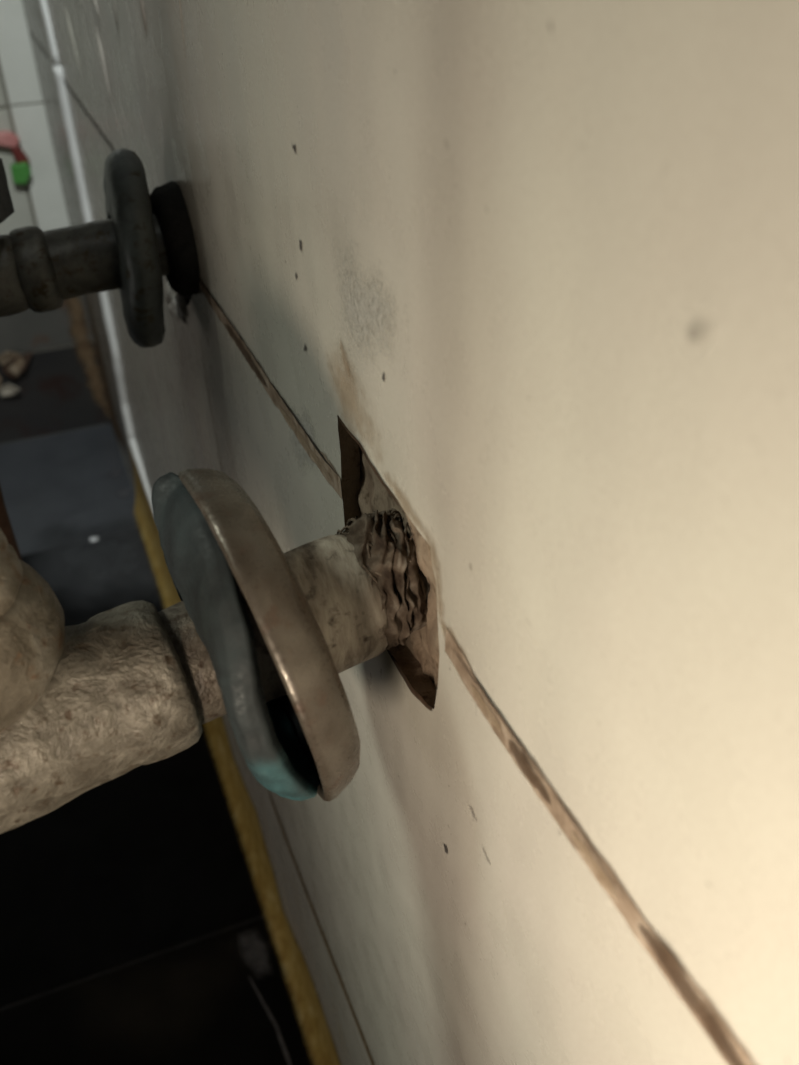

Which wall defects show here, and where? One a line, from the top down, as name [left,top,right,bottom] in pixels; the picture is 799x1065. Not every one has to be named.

spalling [338,416,440,709]